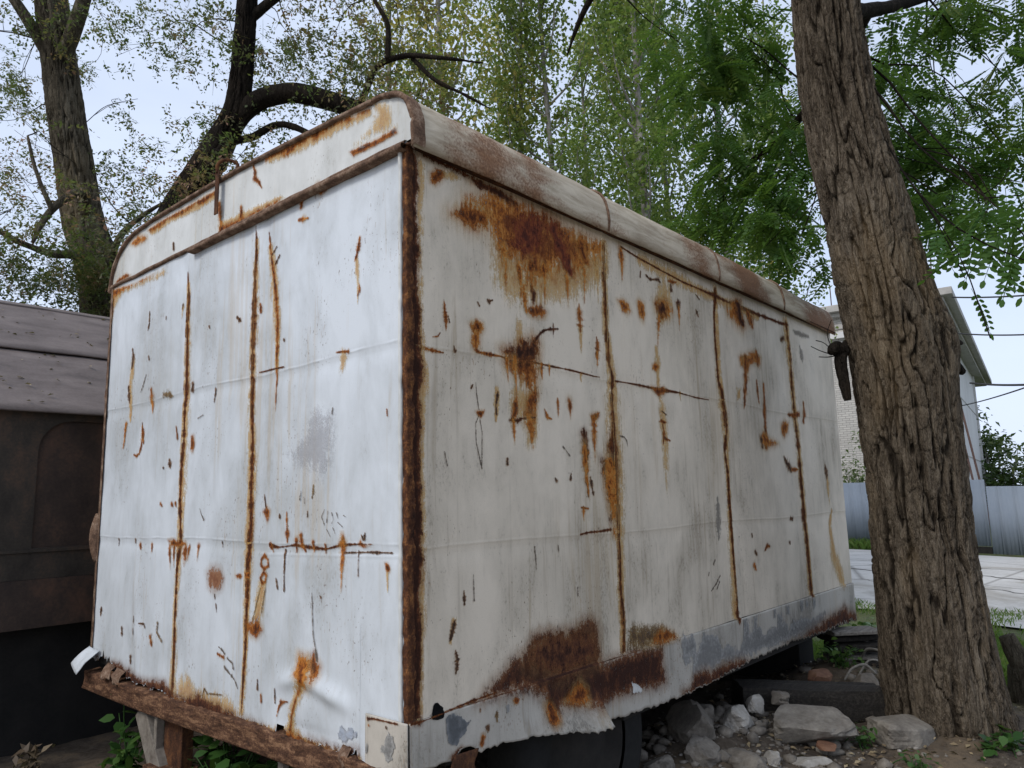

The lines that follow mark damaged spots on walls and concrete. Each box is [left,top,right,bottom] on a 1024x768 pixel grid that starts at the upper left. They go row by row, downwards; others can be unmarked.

rust [252,104,397,189]
rust [131,191,282,245]
rust [367,149,814,727]
rust [111,233,393,759]
peeling [445,708,481,746]